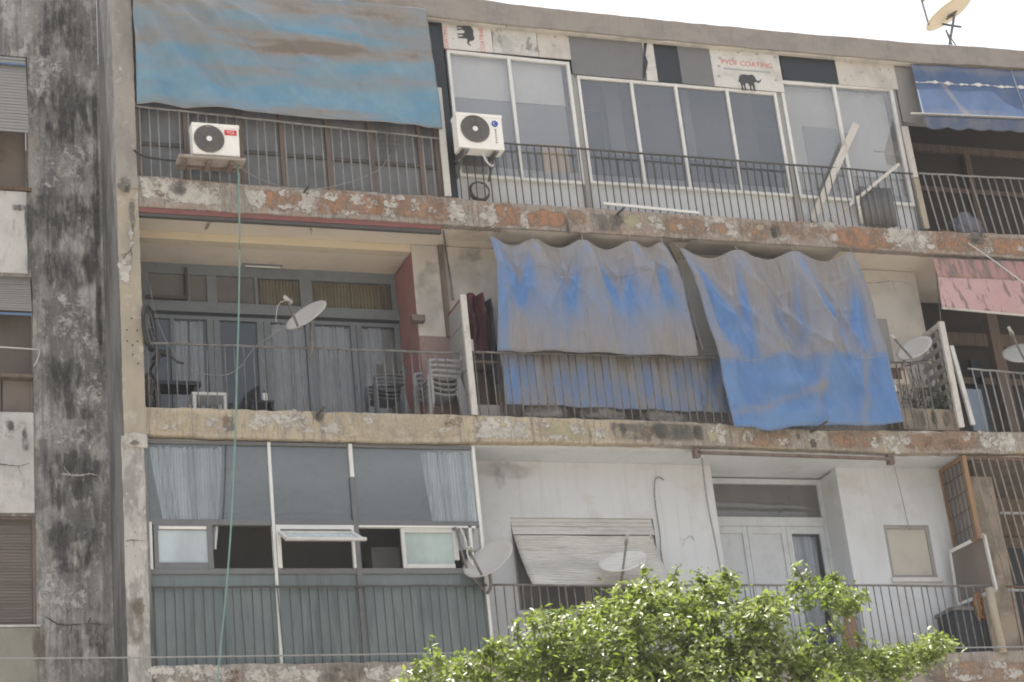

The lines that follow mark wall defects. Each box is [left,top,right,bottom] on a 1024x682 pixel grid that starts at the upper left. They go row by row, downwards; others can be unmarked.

leakage [14,0,102,346]
peeling [118,176,224,247]
peeling [245,189,466,224]
peeling [635,214,1024,256]
peeling [117,259,131,285]
leakage [42,358,99,506]
peeling [223,409,452,438]
leakage [617,424,702,440]
peeling [707,423,726,444]
peeling [870,434,911,454]
peeling [963,430,1017,453]
leakage [41,521,97,609]